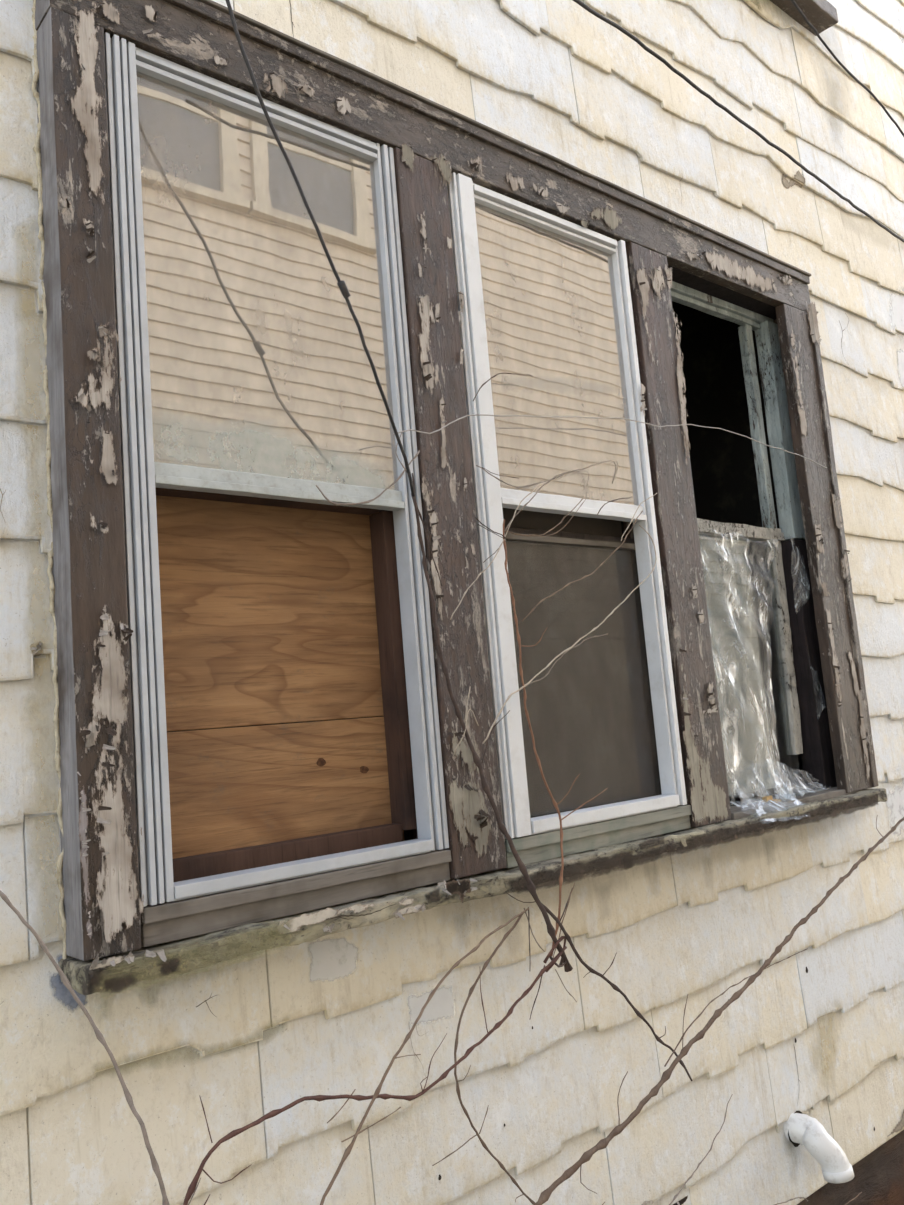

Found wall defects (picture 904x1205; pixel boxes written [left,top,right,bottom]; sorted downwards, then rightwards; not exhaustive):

peeling [68,0,120,205]
peeling [98,430,118,485]
peeling [418,295,449,468]
peeling [636,264,673,364]
peeling [673,312,690,465]
peeling [686,249,793,293]
peeling [790,301,822,436]
peeling [418,474,444,621]
peeling [77,605,167,971]
peeling [448,728,493,858]
peeling [681,682,729,826]
peeling [278,897,426,933]